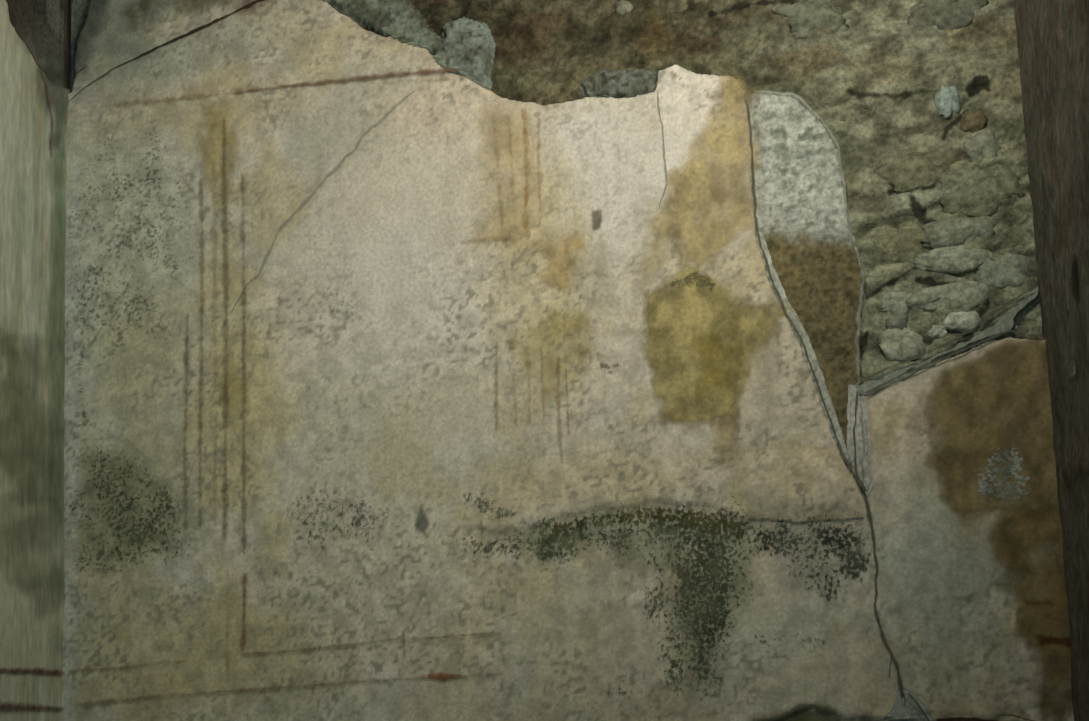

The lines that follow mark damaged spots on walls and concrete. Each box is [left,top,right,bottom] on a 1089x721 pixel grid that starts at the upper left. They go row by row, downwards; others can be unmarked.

flaking render [6,0,107,108]
crack [36,0,263,156]
crack [232,91,414,311]
flaking render [323,0,1044,448]
leakage [65,450,181,572]
leakage [456,492,870,703]
crack [746,101,1042,721]